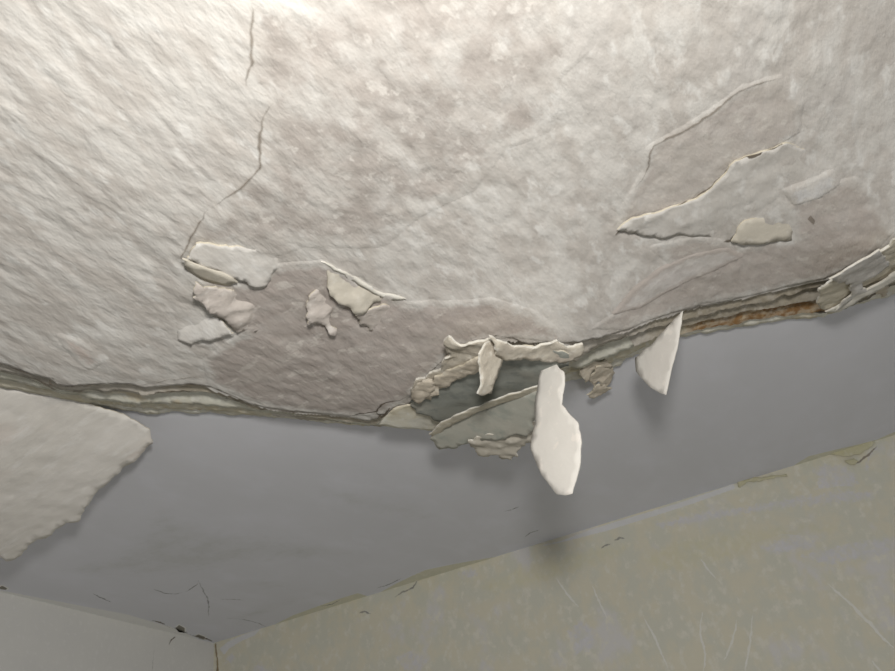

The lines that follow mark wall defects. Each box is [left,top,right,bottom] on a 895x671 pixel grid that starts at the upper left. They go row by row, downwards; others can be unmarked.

crack [228,130,262,197]
crack [647,82,764,170]
peeling [0,0,597,561]
peeling [530,74,895,495]
rust [625,279,831,346]
water stain [135,385,386,427]